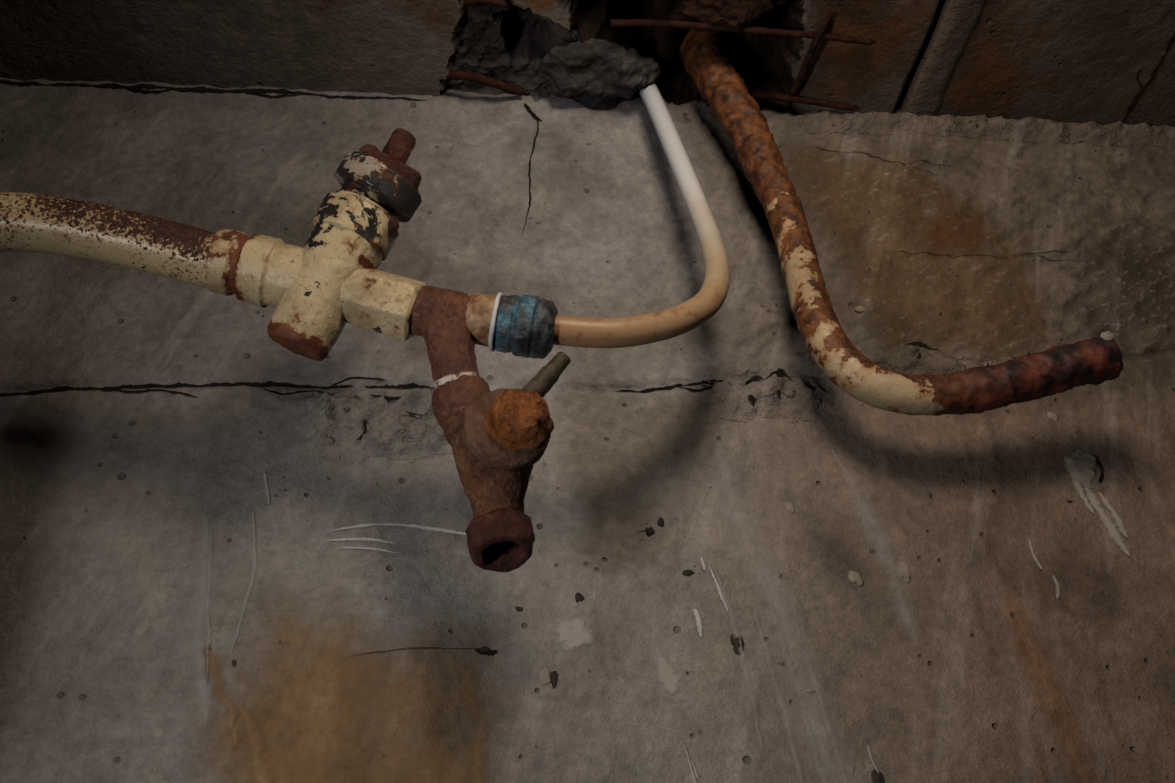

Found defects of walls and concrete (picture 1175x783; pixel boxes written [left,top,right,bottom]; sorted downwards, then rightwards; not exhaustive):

crack [0,80,428,101]
spalling [439,0,710,107]
spalling [717,0,806,111]
crack [0,377,434,398]
spalling [296,381,453,464]
crack [614,379,723,393]